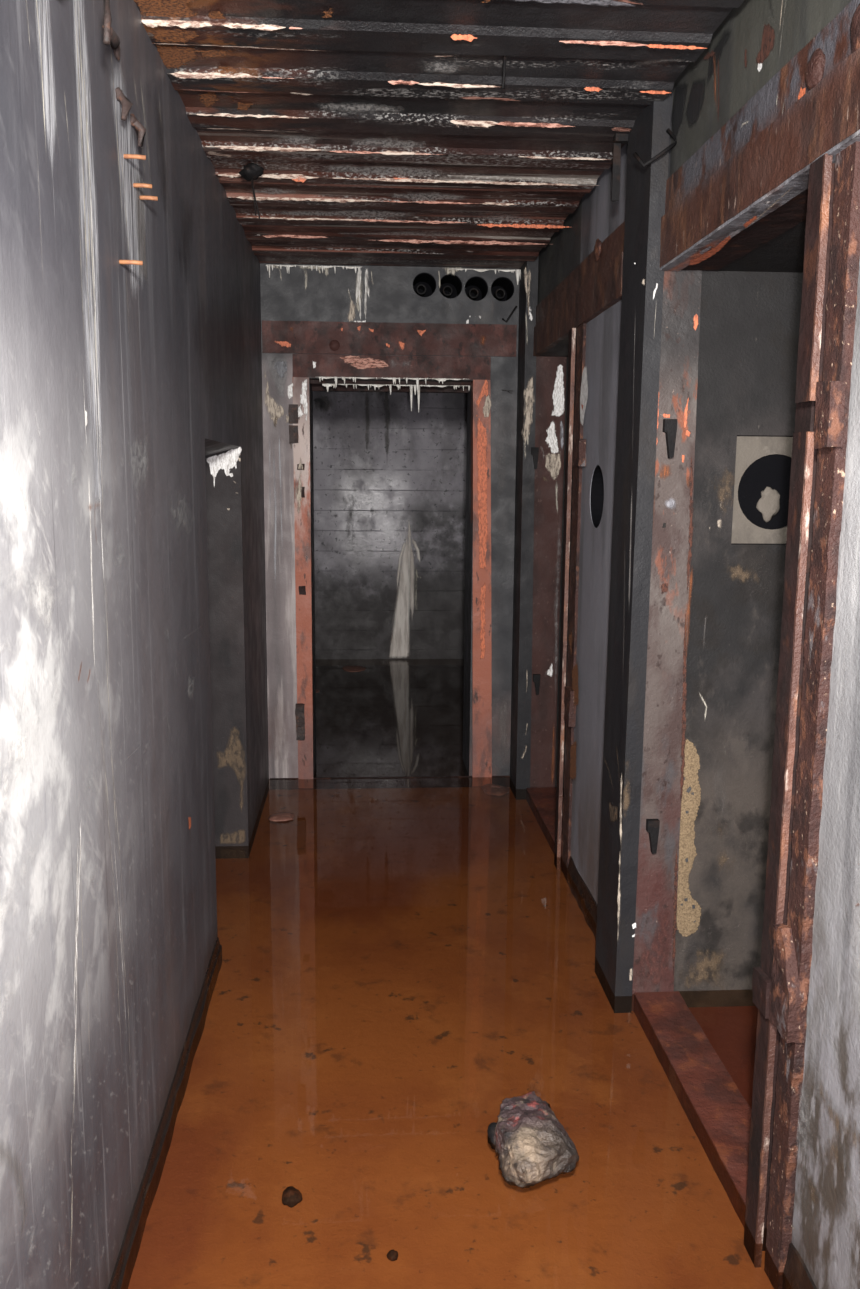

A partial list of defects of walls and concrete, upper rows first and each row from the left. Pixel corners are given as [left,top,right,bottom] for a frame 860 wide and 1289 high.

corrosion [134,0,236,71]
leakage [266,265,372,322]
leakage [439,267,533,328]
leakage [314,377,470,453]
peeling [523,378,533,444]
corrosion [656,397,690,445]
corrosion [661,455,693,820]
spalling [676,739,701,937]